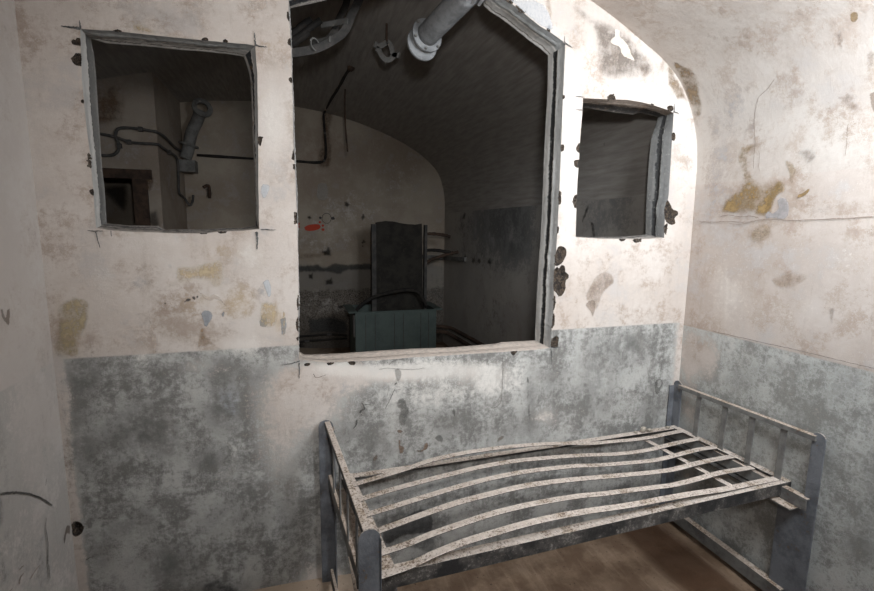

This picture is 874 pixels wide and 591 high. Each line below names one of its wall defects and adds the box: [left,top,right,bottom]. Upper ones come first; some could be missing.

peeling [611,28,634,60]
crack [720,215,872,225]
spalling [551,246,569,347]